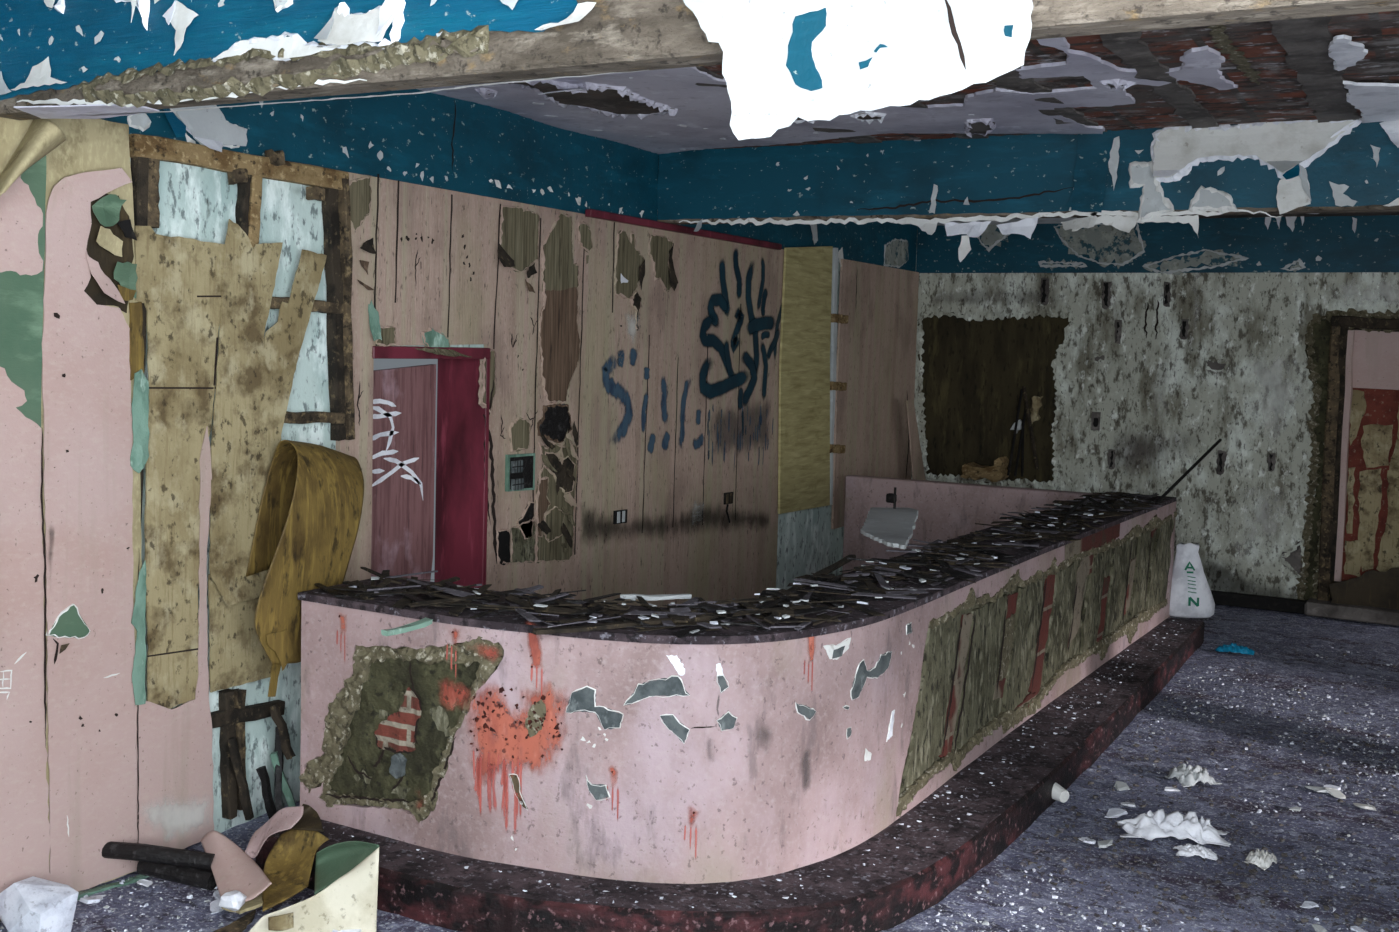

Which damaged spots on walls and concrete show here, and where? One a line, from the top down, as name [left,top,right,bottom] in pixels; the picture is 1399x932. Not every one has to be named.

spalling [0,0,489,152]
peeling [535,2,596,30]
peeling [683,0,1033,140]
peeling [884,118,1399,275]
peeling [497,186,593,403]
damp [916,308,1080,488]
peeling [496,417,581,565]
damp [1209,565,1281,597]
spalling [299,636,504,823]
rust [469,623,565,830]
peeling [566,655,690,748]
spalling [843,510,1178,817]